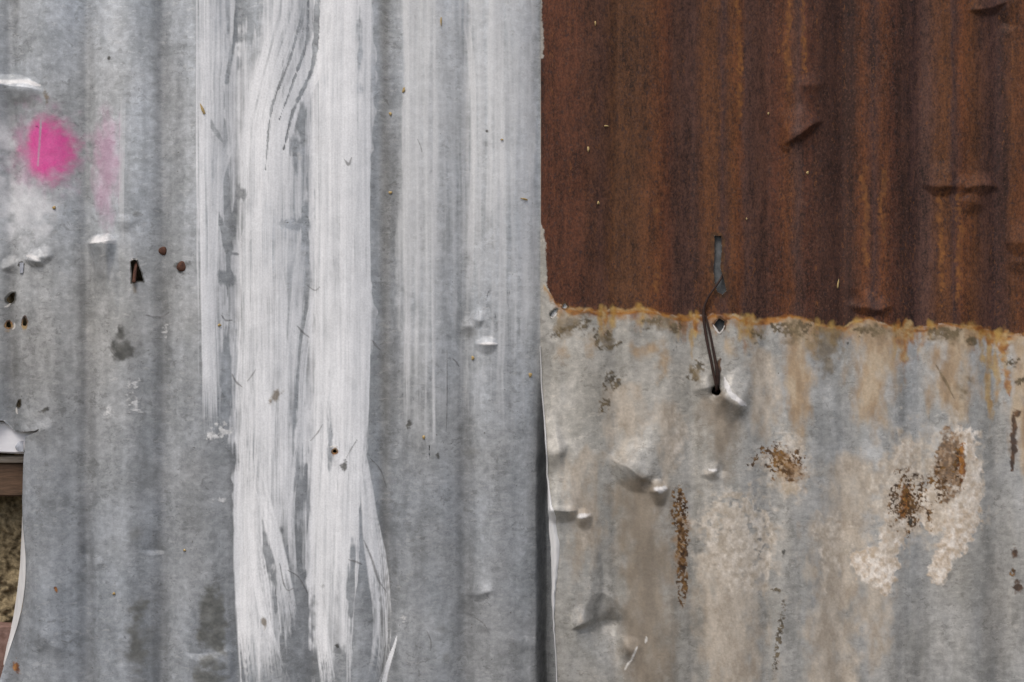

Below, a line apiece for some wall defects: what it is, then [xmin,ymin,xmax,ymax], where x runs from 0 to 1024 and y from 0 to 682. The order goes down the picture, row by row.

corrosion [669,481,694,612]
damp [394,0,1024,682]
corrosion [541,0,1024,472]
corrosion [931,424,963,492]